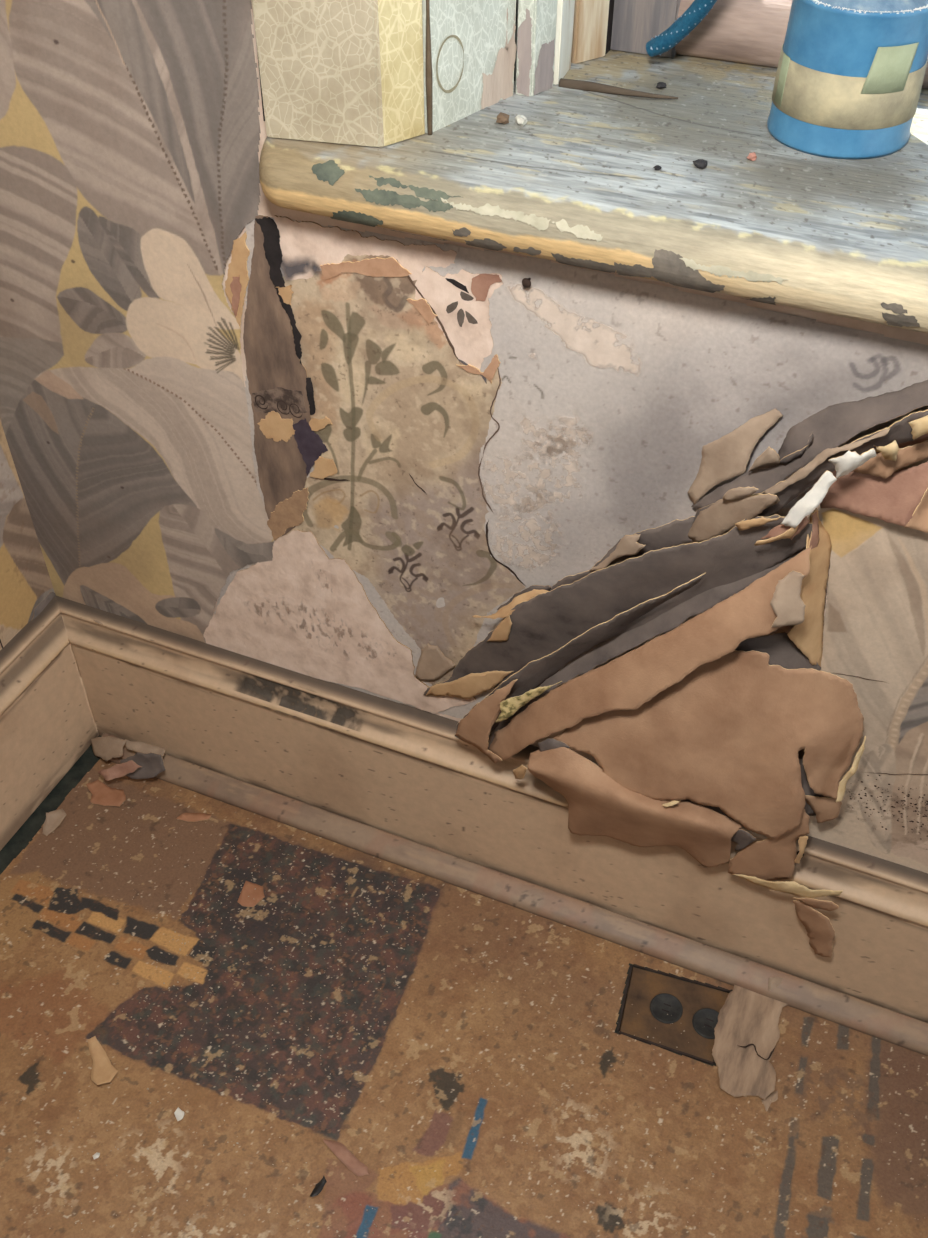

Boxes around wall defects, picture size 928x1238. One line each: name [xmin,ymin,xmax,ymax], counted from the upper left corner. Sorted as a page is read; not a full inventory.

peeling [481,7,555,109]
peeling [312,160,345,186]
flaking render [274,176,789,384]
peeling [881,302,920,327]
peeling [309,417,332,431]
peeling [310,456,338,479]
flaking render [203,530,476,714]
peeling [238,675,357,726]